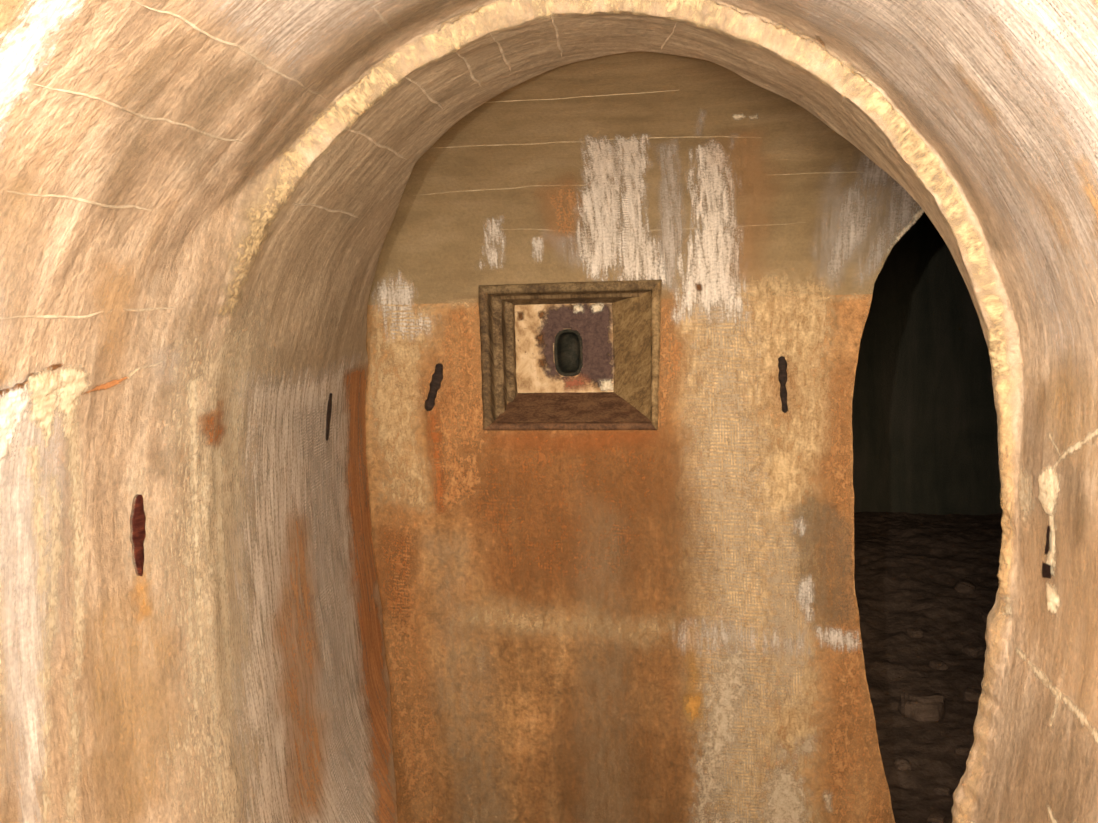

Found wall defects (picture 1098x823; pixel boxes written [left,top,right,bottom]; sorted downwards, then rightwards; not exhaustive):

leakage [221,0,384,64]
spalling [219,0,554,315]
leakage [810,0,1098,354]
leakage [480,219,504,268]
leakage [532,237,542,261]
spalling [570,0,1060,662]
peeling [0,366,89,460]
rust [422,306,488,511]
leakage [577,134,859,823]
crack [1049,429,1098,468]
rust [129,494,146,604]
crack [1016,649,1098,743]